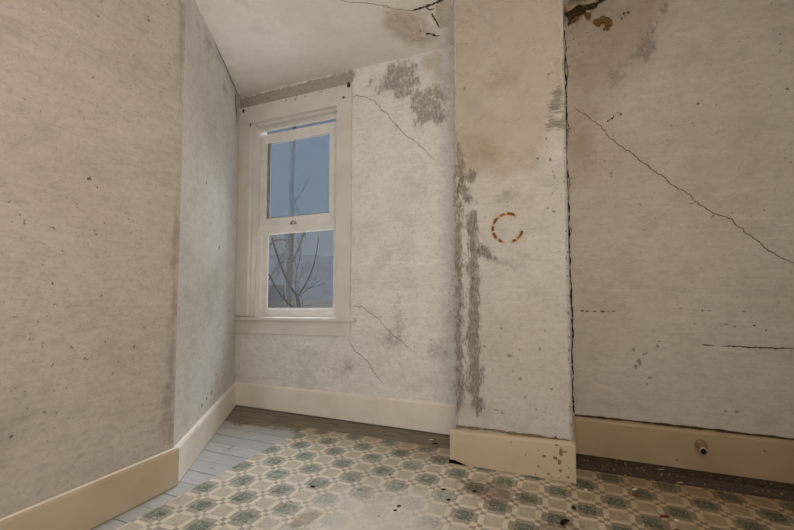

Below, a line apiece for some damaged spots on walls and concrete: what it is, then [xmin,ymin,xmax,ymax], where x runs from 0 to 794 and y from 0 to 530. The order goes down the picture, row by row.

spalling [564,0,612,31]
crack [354,94,441,165]
crack [564,31,794,440]
crack [352,305,417,354]